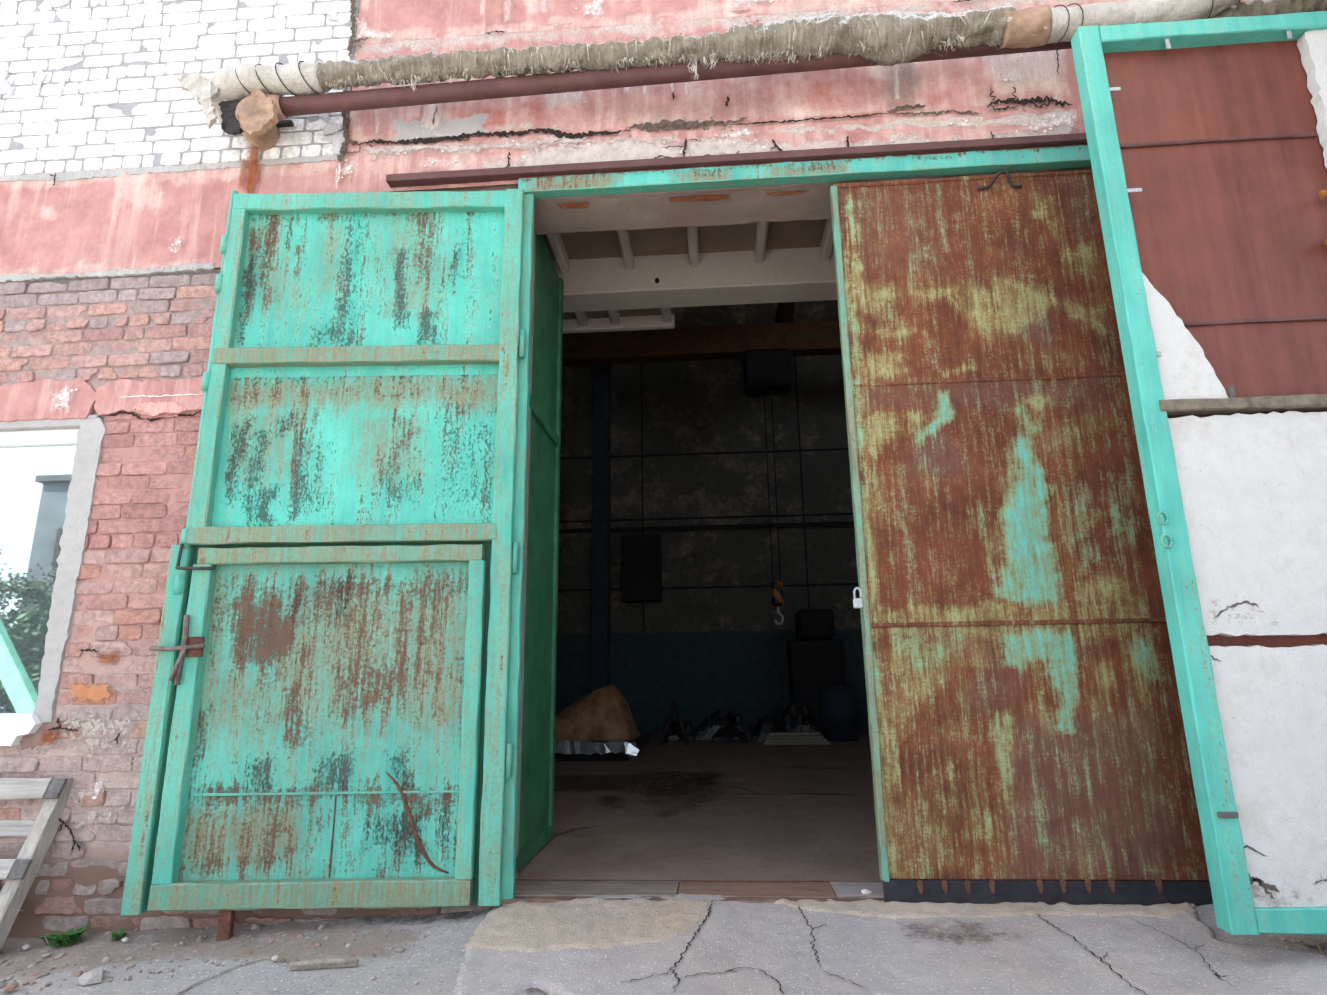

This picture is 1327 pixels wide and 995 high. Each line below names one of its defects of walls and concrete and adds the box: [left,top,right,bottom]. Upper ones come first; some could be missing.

crack [325,0,1072,167]
corrosion [240,144,261,194]
crack [175,958,279,995]
crack [622,904,784,994]
crack [798,906,862,987]